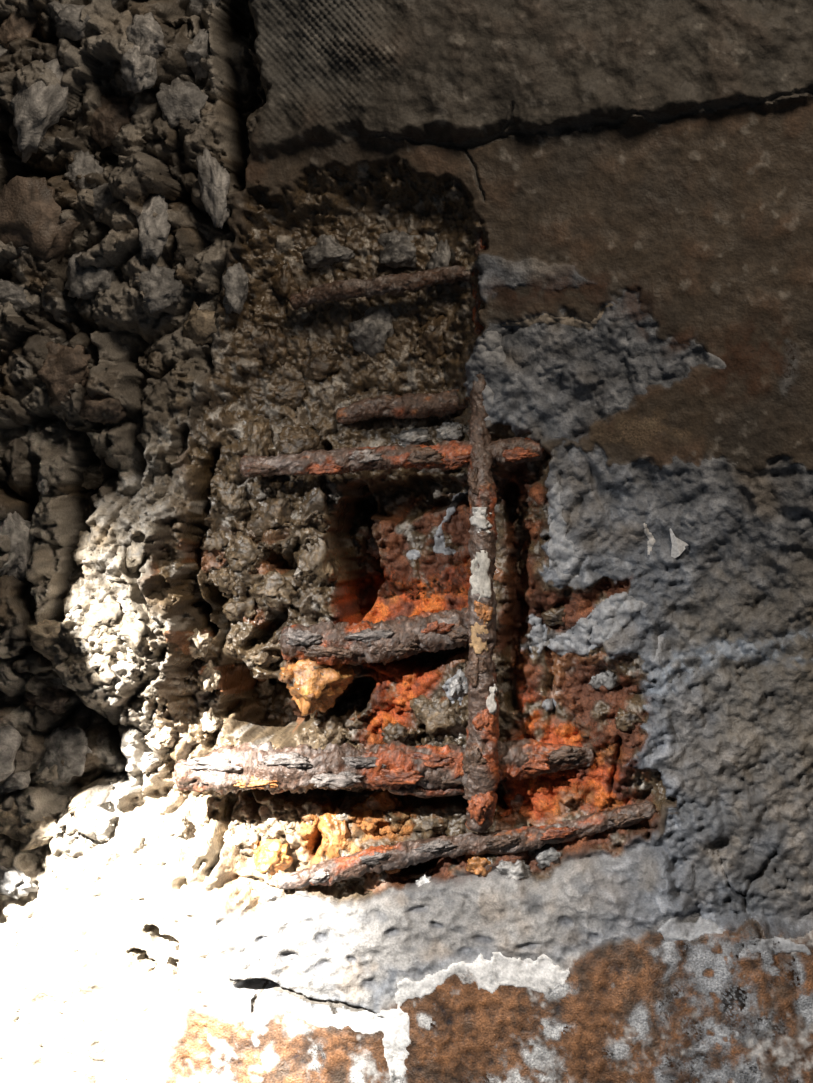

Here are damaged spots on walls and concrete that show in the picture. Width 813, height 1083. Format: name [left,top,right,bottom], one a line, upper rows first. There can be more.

corrosion [334,498,471,625]
spalling [124,161,813,1083]
corrosion [495,465,647,821]
corrosion [360,657,441,746]
corrosion [299,797,343,864]
corrosion [342,785,465,854]
corrosion [407,854,477,879]
corrosion [496,850,541,871]
corrosion [542,796,657,852]
corrosion [390,921,813,1083]
corrosion [165,1011,391,1083]